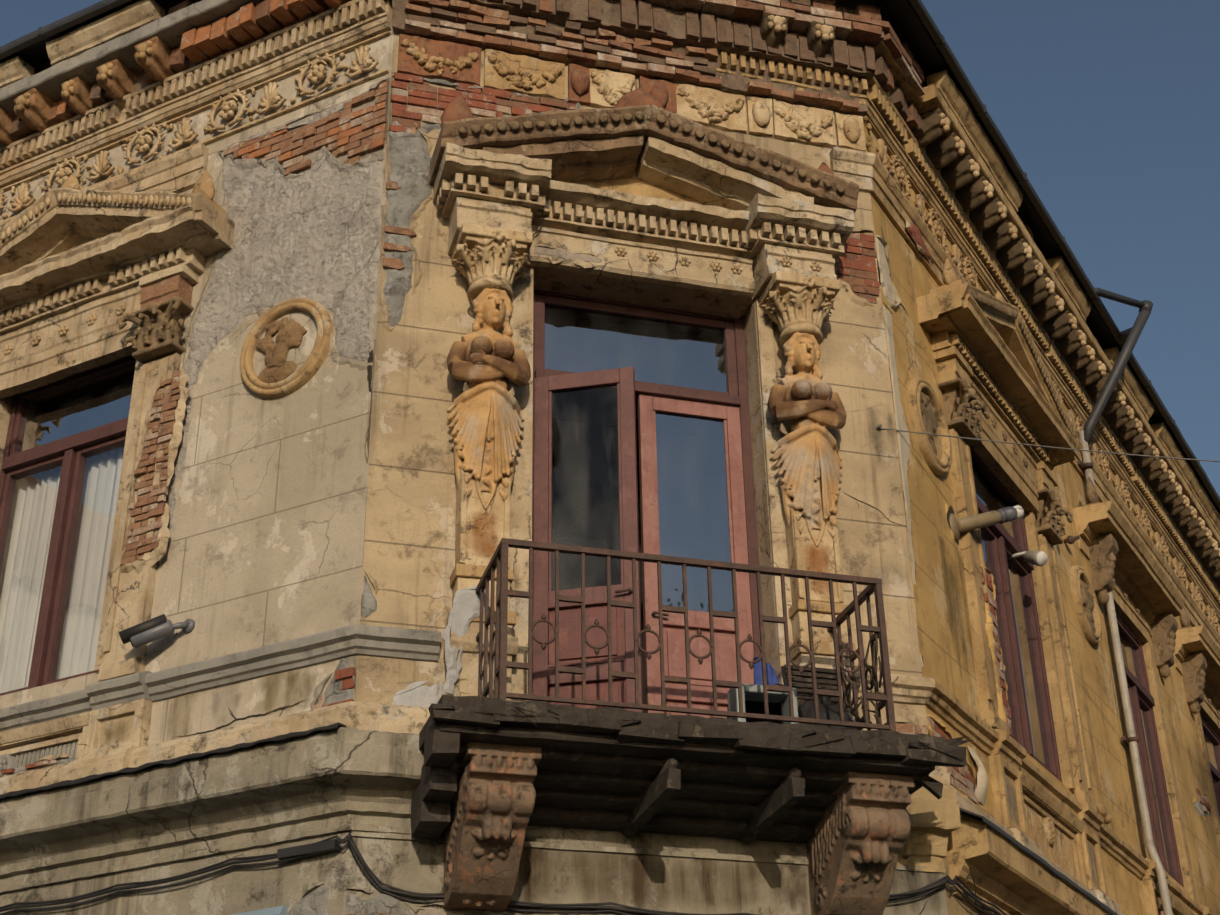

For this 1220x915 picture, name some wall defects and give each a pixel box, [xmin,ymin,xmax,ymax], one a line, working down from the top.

spalling [120,72,581,574]
flaking render [834,227,918,591]
peeling [393,586,485,707]
flaking render [980,566,1012,737]
crack [175,700,305,737]
flaking render [871,713,952,740]
flaking render [945,758,978,804]